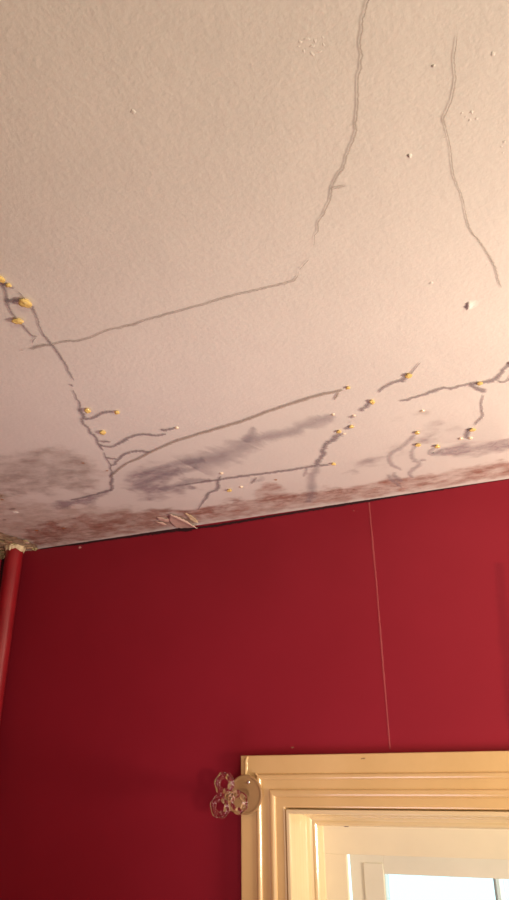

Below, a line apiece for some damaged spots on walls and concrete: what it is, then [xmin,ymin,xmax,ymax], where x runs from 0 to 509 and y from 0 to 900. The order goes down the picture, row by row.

crack [314,0,369,239]
crack [443,40,501,286]
flaking render [0,532,38,559]
crack [0,266,303,500]
peeling [155,513,198,528]
damp [106,386,350,477]
crack [41,363,509,550]